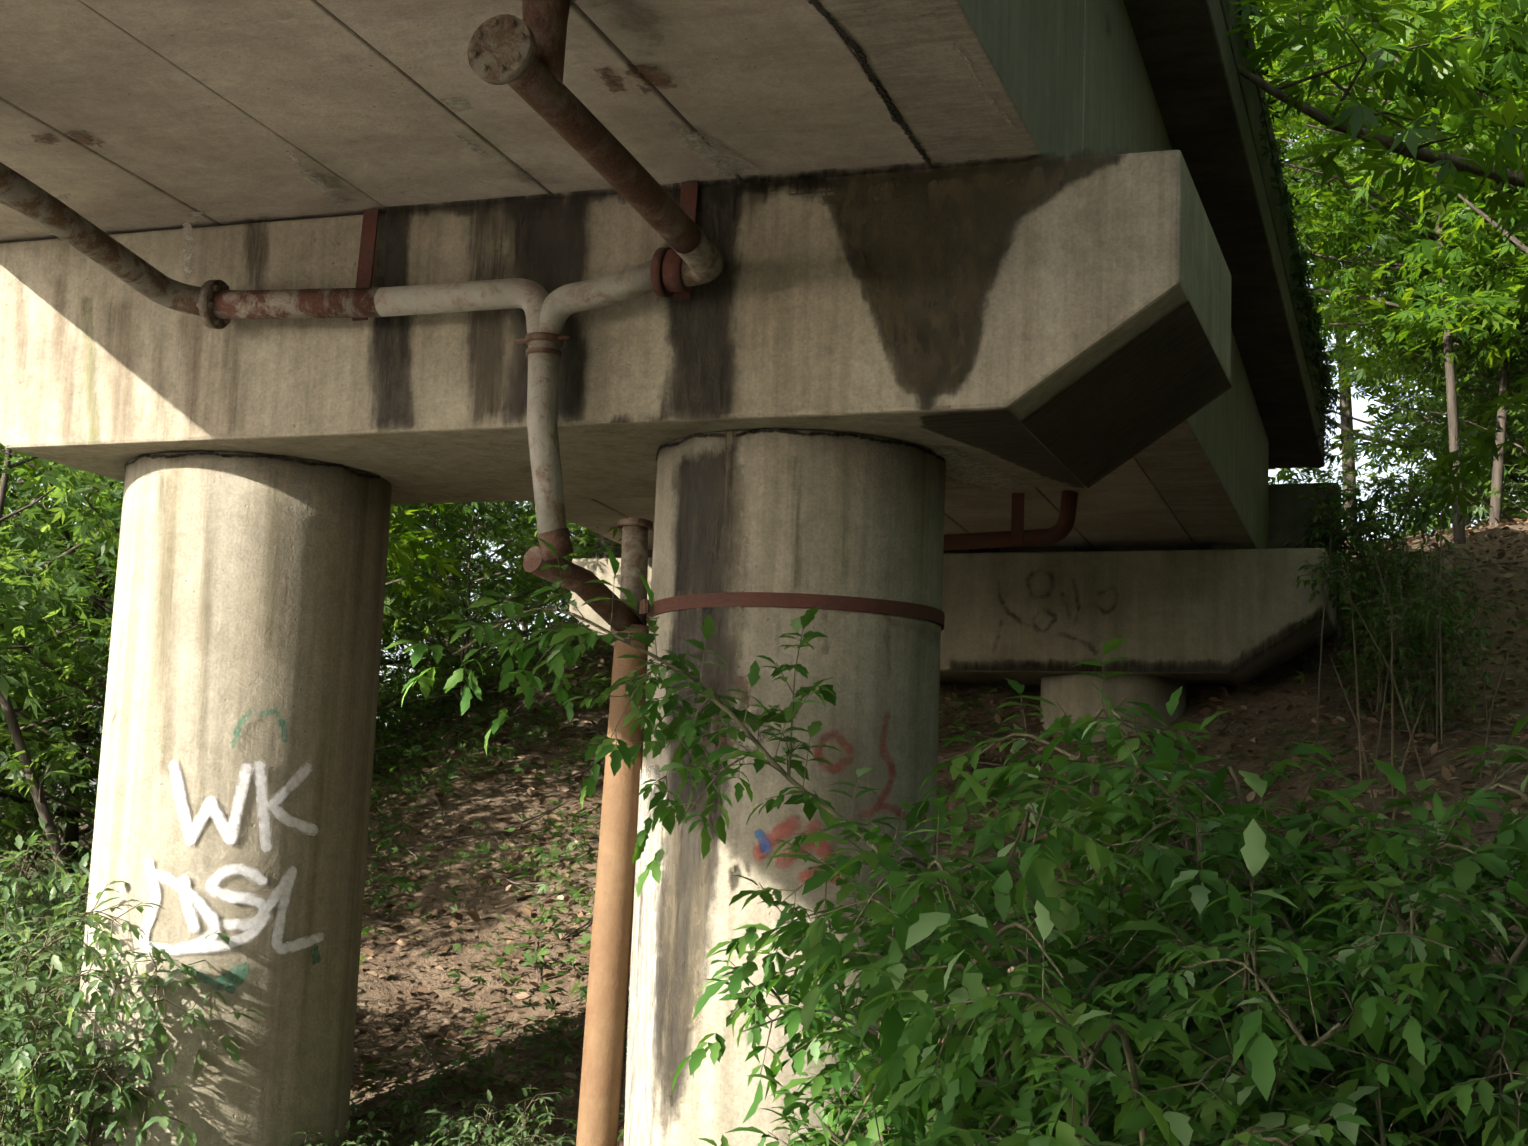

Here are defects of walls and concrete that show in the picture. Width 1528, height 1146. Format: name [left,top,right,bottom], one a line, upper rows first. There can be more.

corrosion [601,64,676,92]
crack [807,0,931,161]
leakage [378,191,625,294]
leakage [369,315,413,429]
leakage [467,308,528,422]
leakage [557,314,586,418]
leakage [624,122,1232,1146]